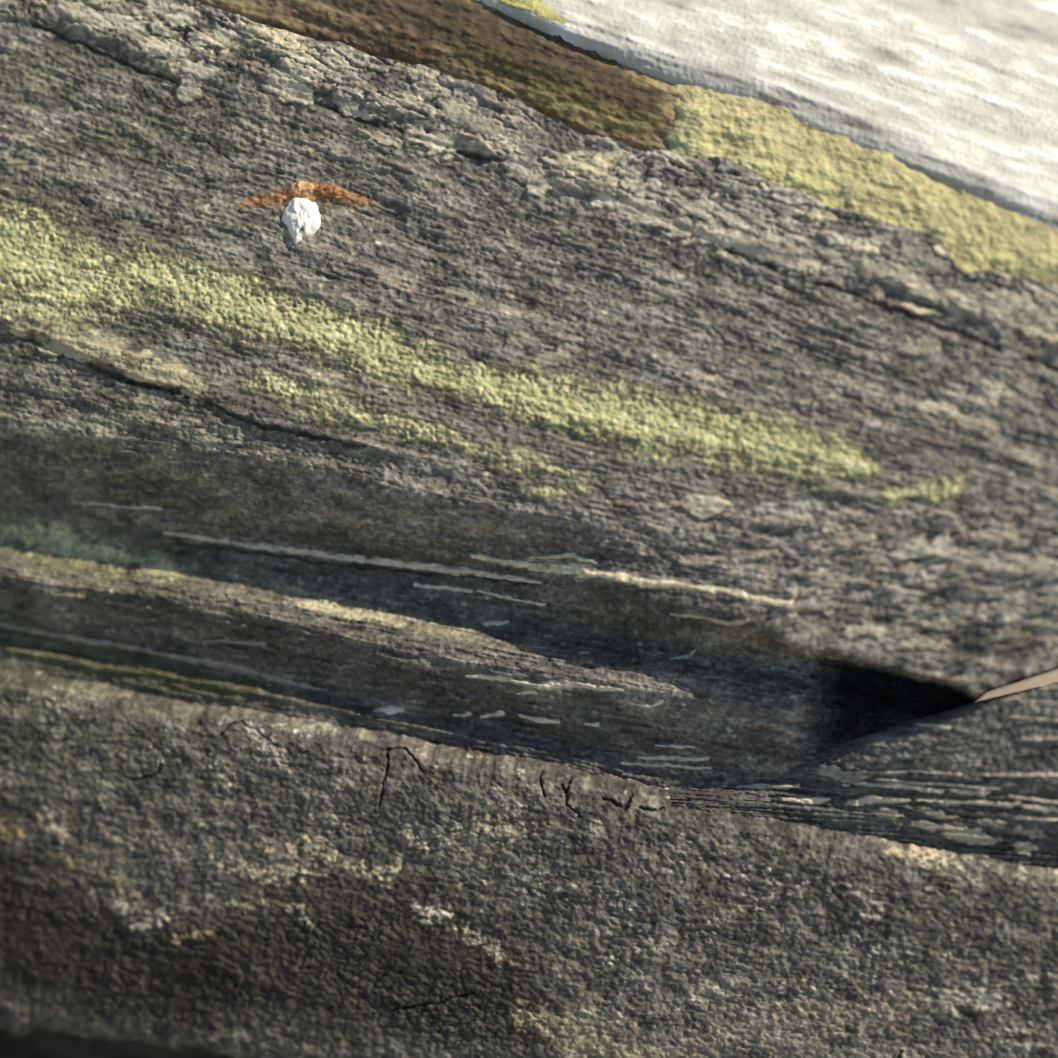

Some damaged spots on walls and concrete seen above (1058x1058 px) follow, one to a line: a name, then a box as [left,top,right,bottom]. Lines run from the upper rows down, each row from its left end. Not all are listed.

corrosion [240,182,375,208]